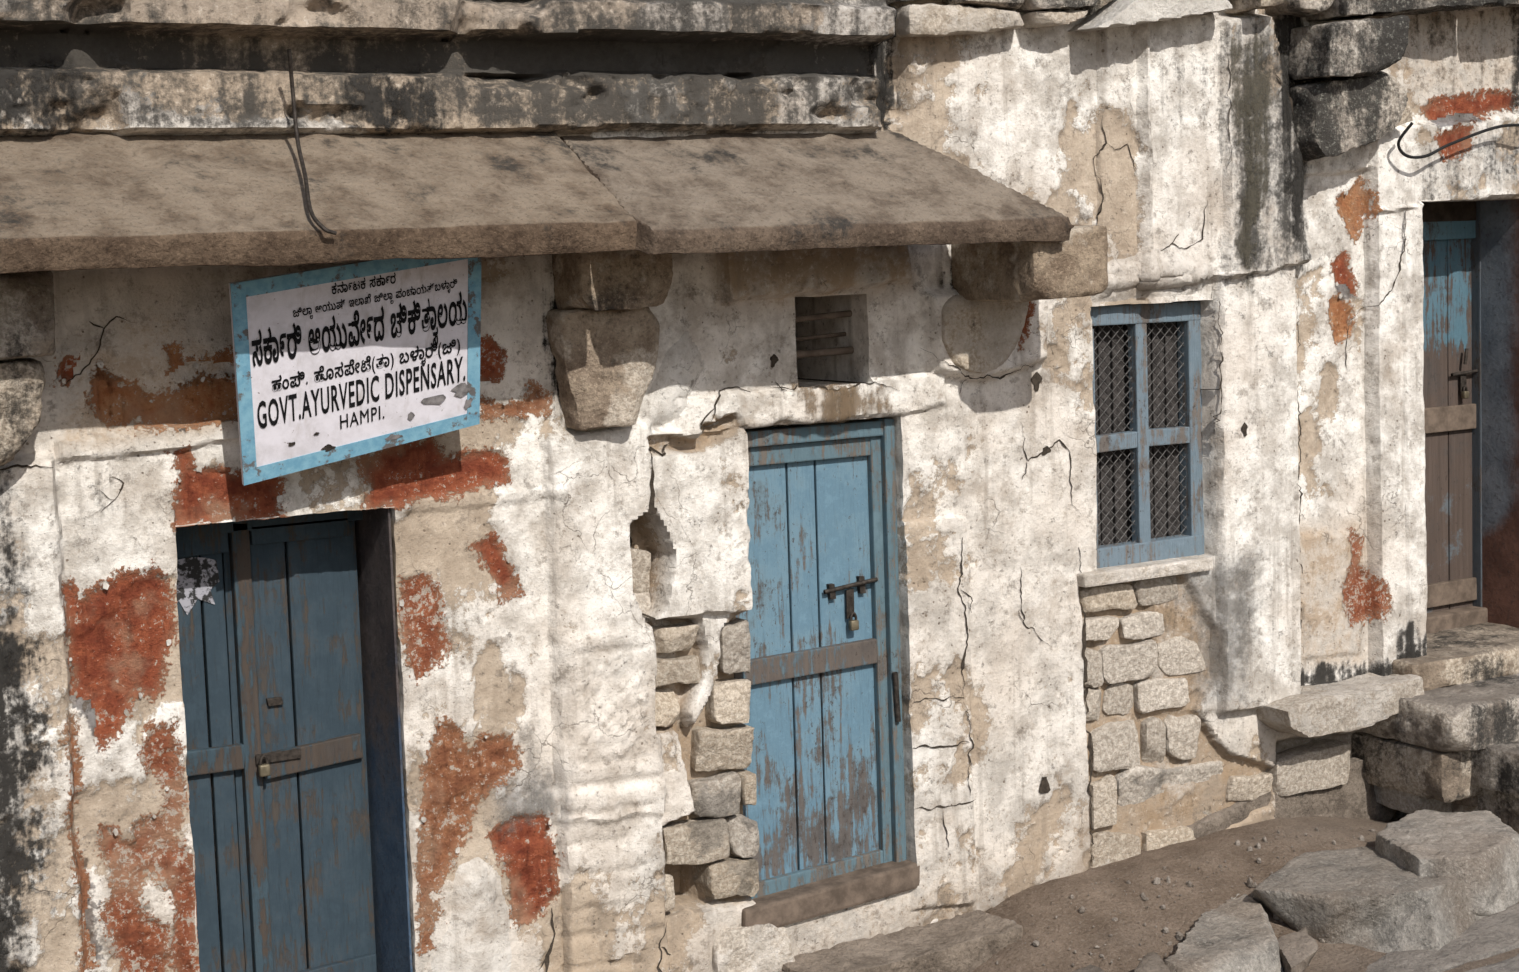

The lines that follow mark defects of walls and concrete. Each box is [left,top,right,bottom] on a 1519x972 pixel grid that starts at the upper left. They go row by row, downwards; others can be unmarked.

crack [1093,126,1137,223]
damp [1230,15,1304,292]
peeling [1325,174,1384,345]
peeling [1420,85,1518,163]
damp [1511,7,1519,135]
peeling [49,340,290,533]
peeling [396,571,460,686]
peeling [467,530,528,605]
damp [0,471,56,972]
peeling [58,559,200,972]
peeling [413,715,569,957]